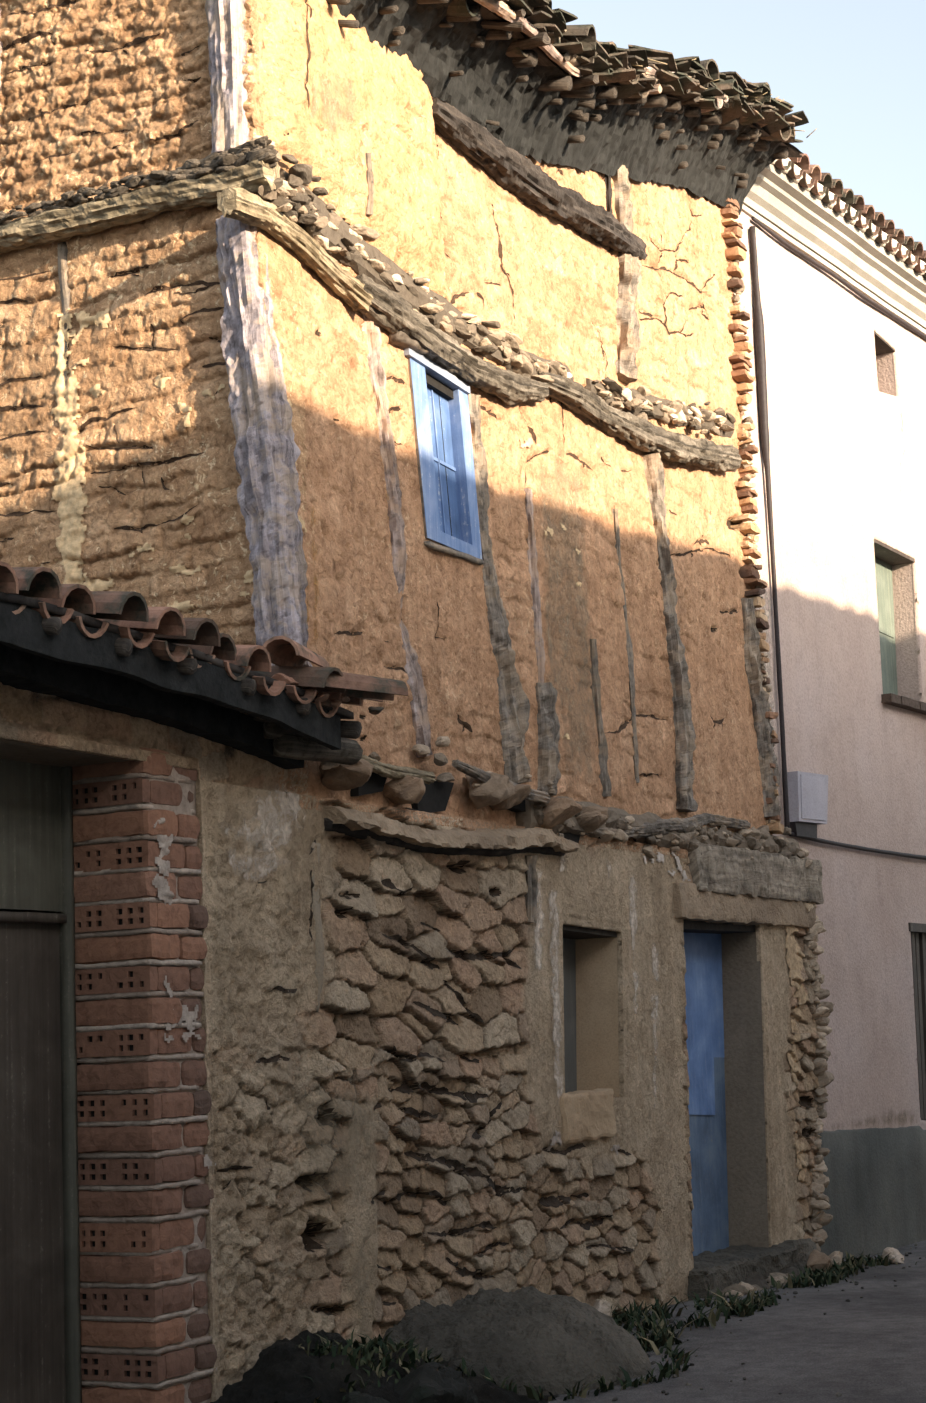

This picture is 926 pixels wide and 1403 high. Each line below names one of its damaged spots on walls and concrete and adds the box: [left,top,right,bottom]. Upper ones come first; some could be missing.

crack [451,204,515,319]
crack [639,210,715,337]
crack [669,510,731,558]
spalling [446,860,470,874]
spalling [334,891,360,920]
spalling [315,1102,342,1127]
spalling [300,1220,327,1252]